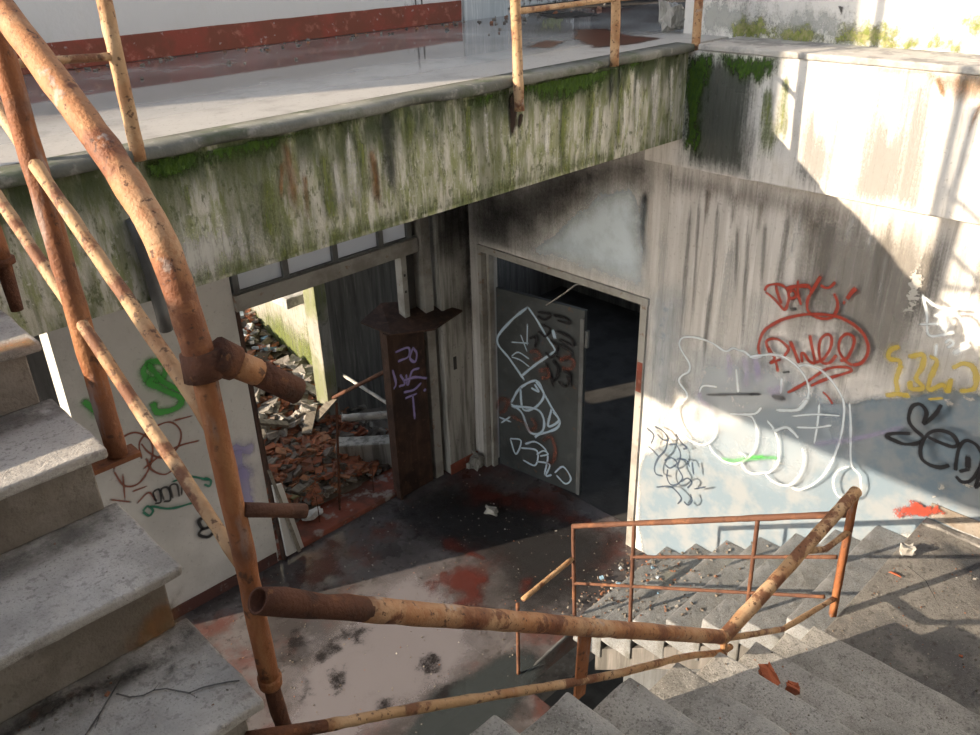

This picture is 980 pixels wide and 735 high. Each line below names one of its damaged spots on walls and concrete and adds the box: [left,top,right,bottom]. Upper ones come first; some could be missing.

damp [374,113,395,198]
damp [689,58,754,171]
damp [798,118,831,181]
damp [856,83,929,206]
damp [183,236,244,275]
crack [85,679,240,735]
damp [403,652,545,735]